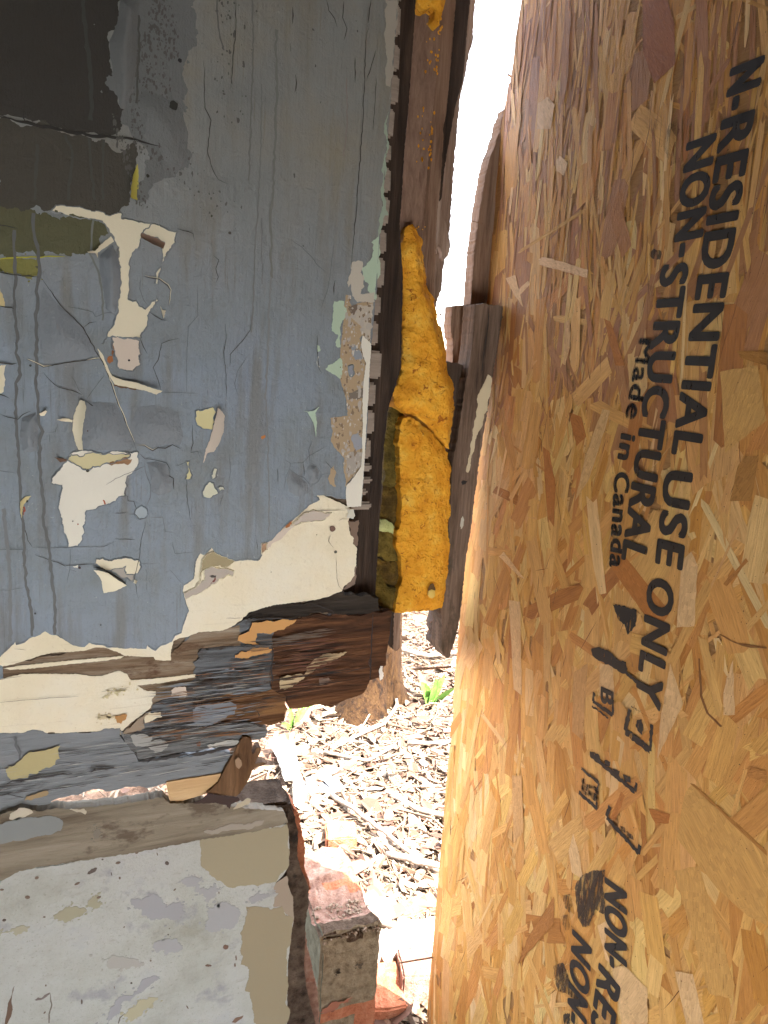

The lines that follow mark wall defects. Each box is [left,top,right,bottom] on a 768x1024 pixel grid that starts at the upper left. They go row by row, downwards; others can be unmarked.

crack [0,116,158,146]
peeling [52,451,138,547]
crack [0,272,199,592]
peeling [52,206,176,371]
water stain [0,0,242,642]
crack [204,68,227,184]
crack [223,324,251,393]
water stain [214,0,279,533]
crack [294,0,377,307]
peeling [317,112,389,546]
peeling [0,619,346,844]
flaking render [200,778,294,1024]